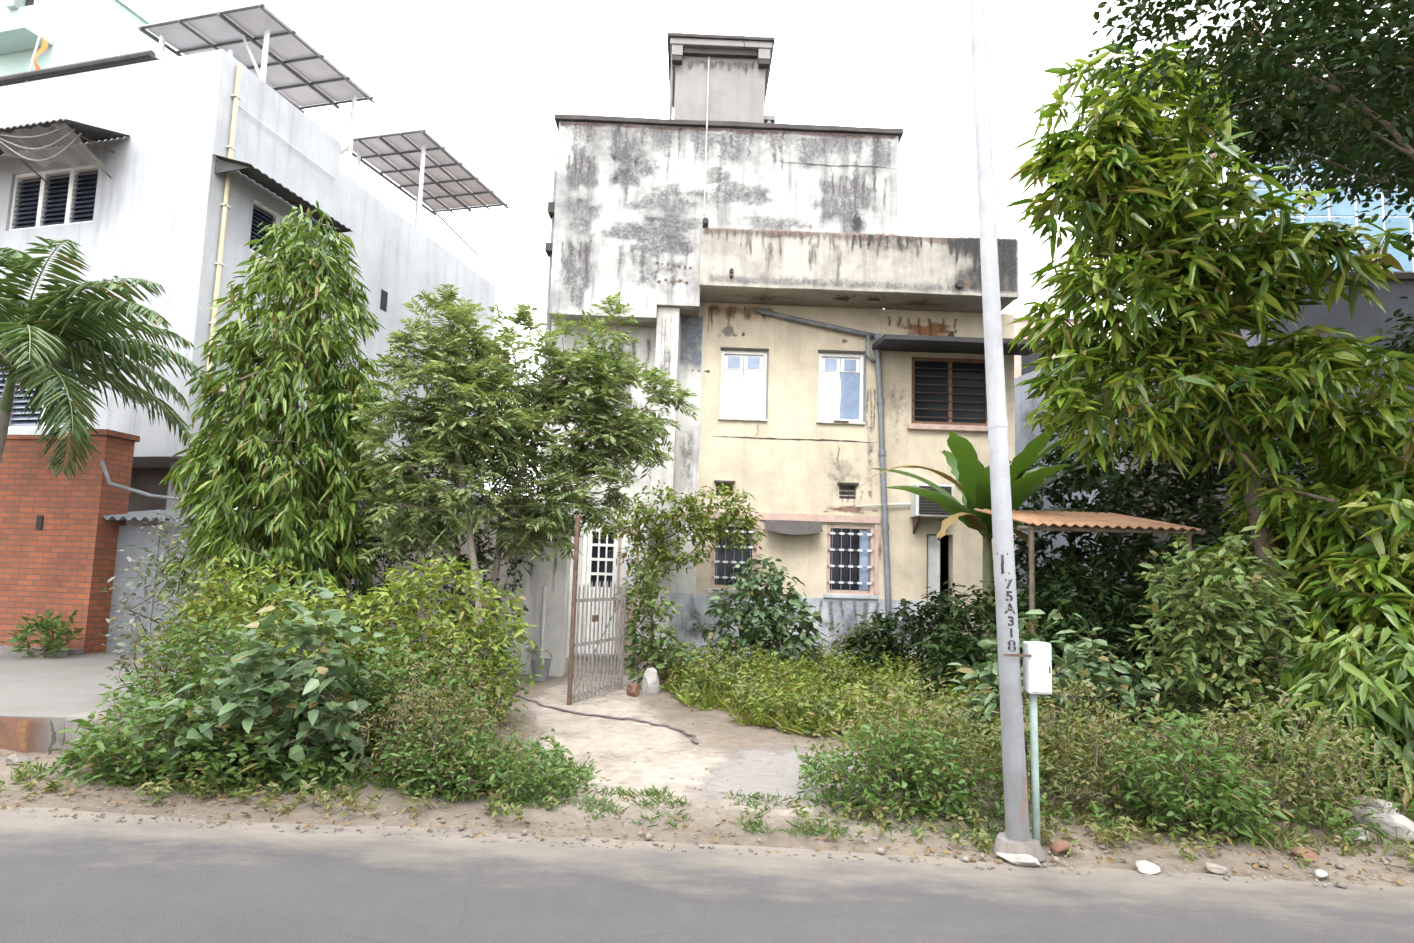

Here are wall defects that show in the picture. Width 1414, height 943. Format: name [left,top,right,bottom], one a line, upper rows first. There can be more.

leakage [562,127,982,308]
leakage [997,238,1017,291]
corrosion [888,302,957,336]